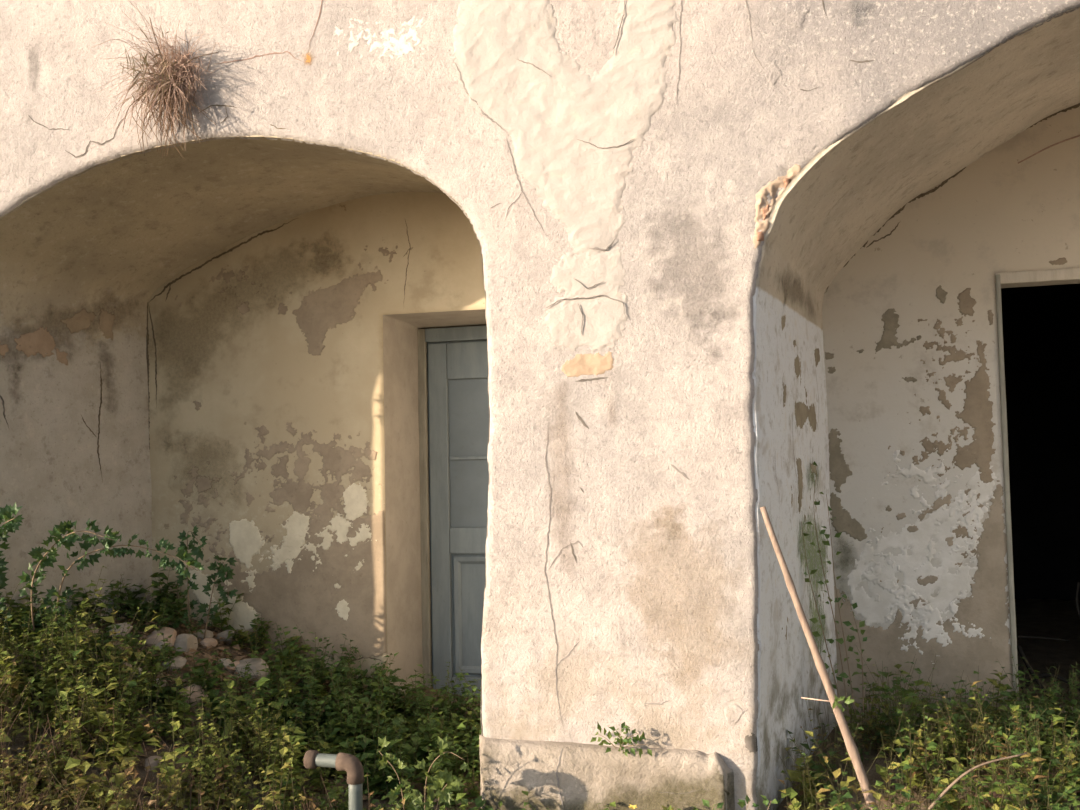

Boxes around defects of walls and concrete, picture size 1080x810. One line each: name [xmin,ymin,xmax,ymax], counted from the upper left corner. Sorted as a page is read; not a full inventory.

crack [217,0,323,64]
peeling [334,16,434,67]
crack [491,137,543,229]
flaking render [753,164,803,249]
crack [825,167,966,293]
crack [81,365,103,482]
crack [146,218,297,450]
flaking render [275,245,413,356]
flaking render [782,340,817,432]
flaking render [174,422,387,659]
flaking render [791,285,1013,727]
crack [544,422,583,810]